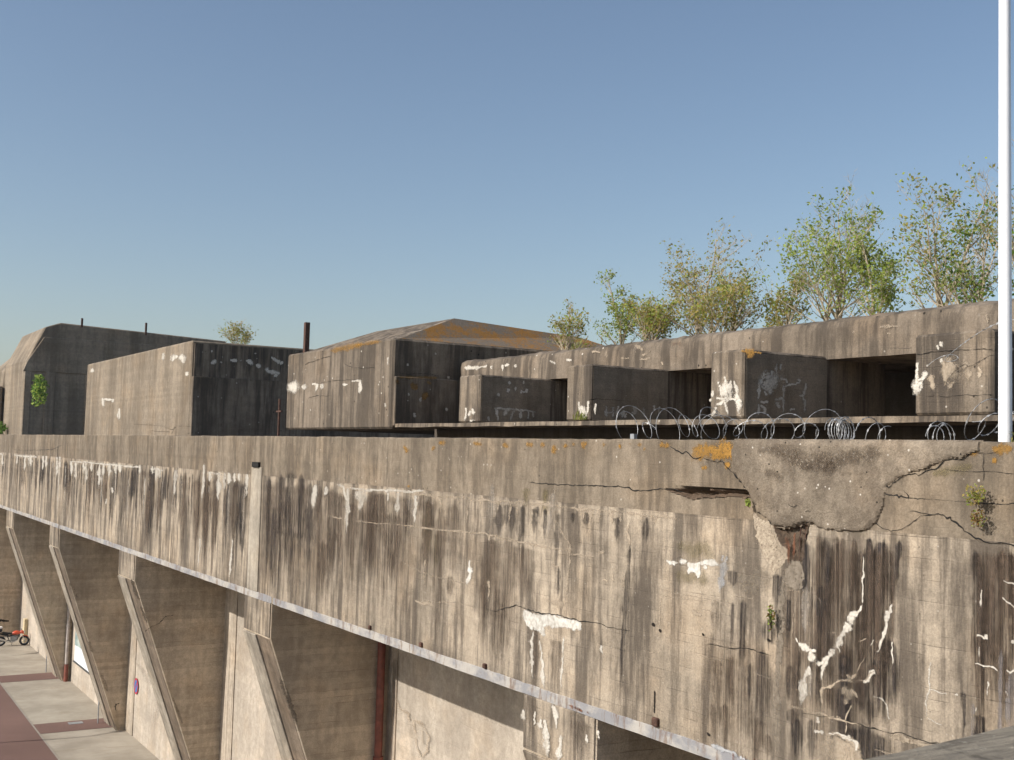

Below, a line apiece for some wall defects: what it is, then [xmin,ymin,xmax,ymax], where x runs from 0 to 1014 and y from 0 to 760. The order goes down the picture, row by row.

leakage [0,453,249,575]
leakage [266,475,604,686]
crack [482,605,630,631]
leakage [571,507,675,669]
leakage [666,559,718,578]
crack [670,446,772,525]
leakage [701,596,770,706]
spalling [753,513,809,732]
leakage [764,537,902,760]
crack [876,452,1014,546]
leakage [925,551,1014,736]
efflorescence [521,705,562,760]